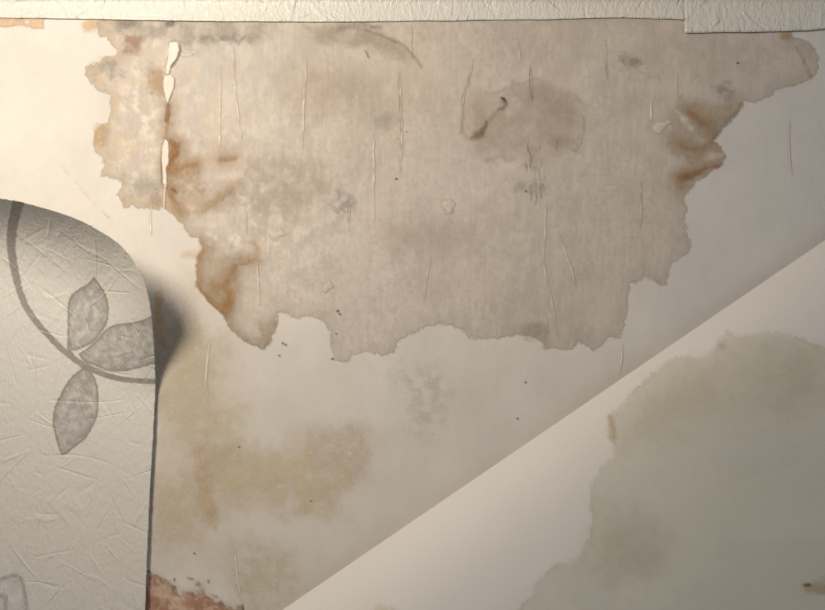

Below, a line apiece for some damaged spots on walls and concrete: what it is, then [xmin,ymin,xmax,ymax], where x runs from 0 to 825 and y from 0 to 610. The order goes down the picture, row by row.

water stain [83,18,818,362]
spalling [145,575,243,610]
water stain [521,332,825,610]